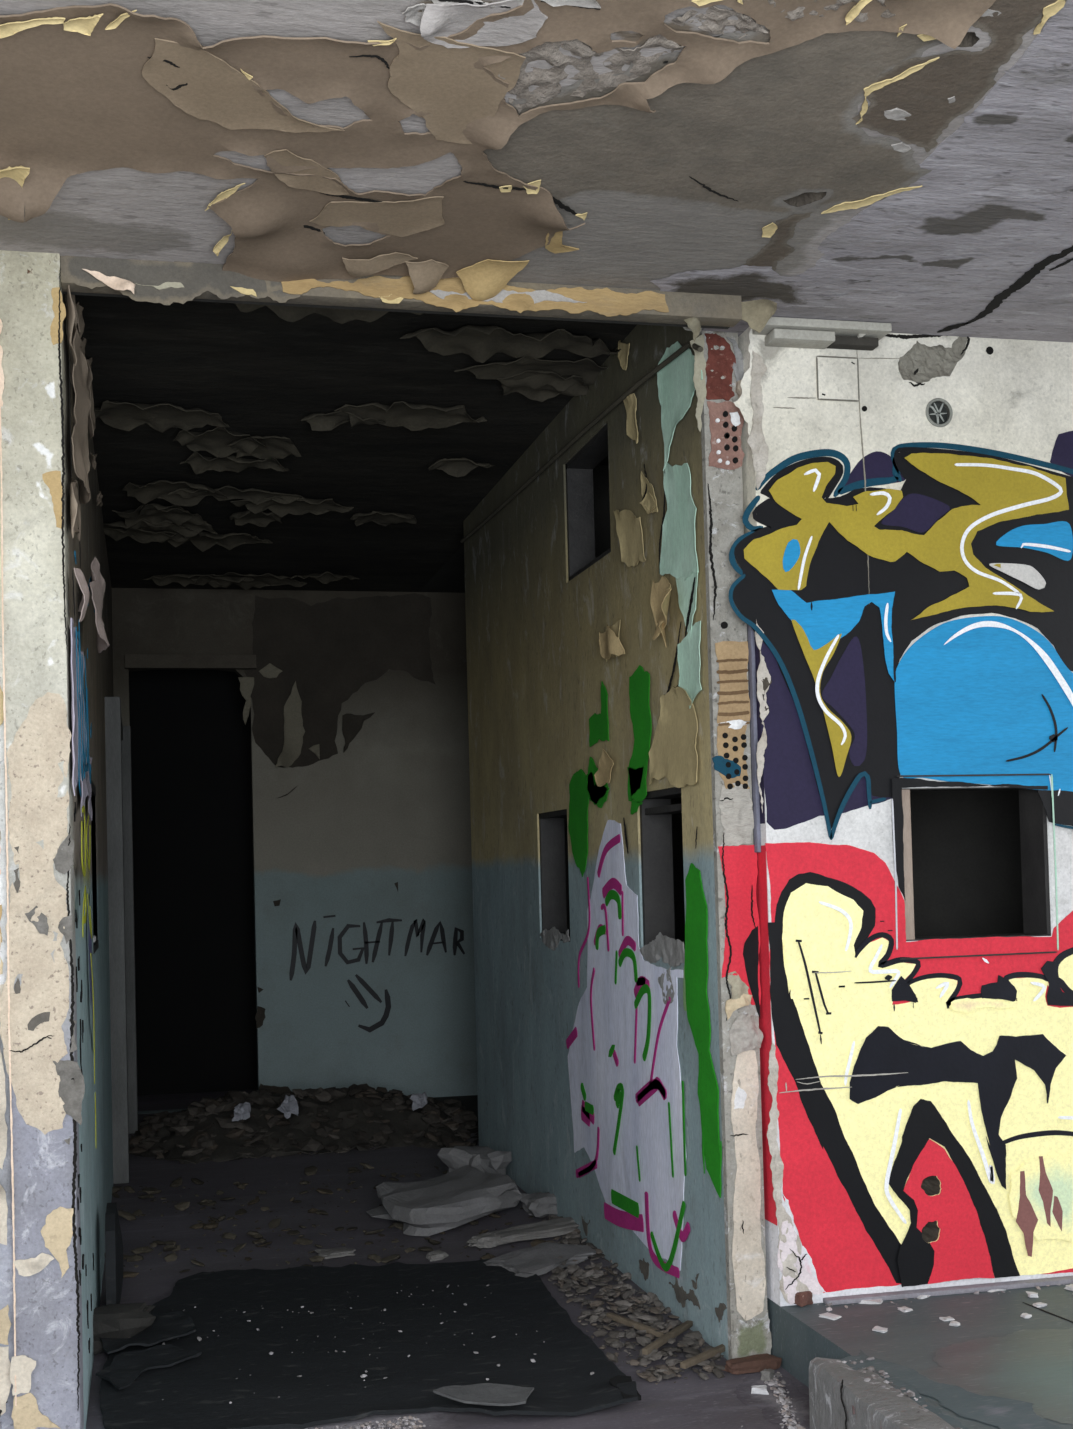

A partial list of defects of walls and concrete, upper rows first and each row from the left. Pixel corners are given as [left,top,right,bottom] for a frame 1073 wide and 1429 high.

peeling [0,0,1001,402]
peeling [741,0,1073,384]
crack [773,397,812,409]
crack [856,245,1073,491]
peeling [0,319,110,1429]
peeling [143,571,435,768]
peeling [594,749,614,787]
peeling [599,620,625,662]
peeling [614,317,772,846]